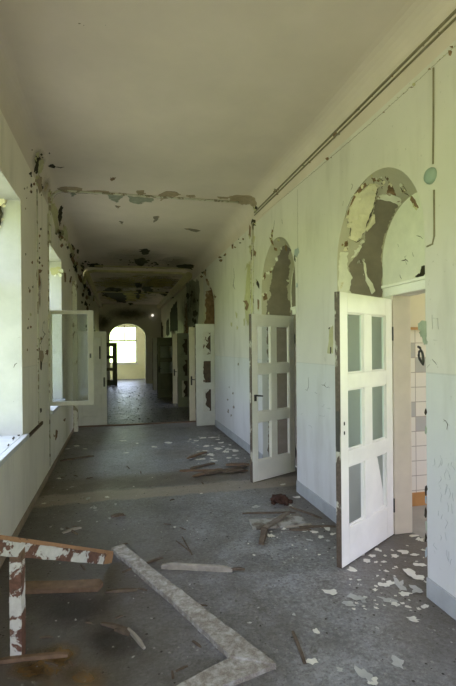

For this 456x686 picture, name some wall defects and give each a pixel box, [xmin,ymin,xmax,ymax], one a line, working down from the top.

peeling [24,152,196,311]
peeling [338,181,419,298]
peeling [184,269,216,333]
peeling [218,195,299,466]
peeling [418,321,428,345]